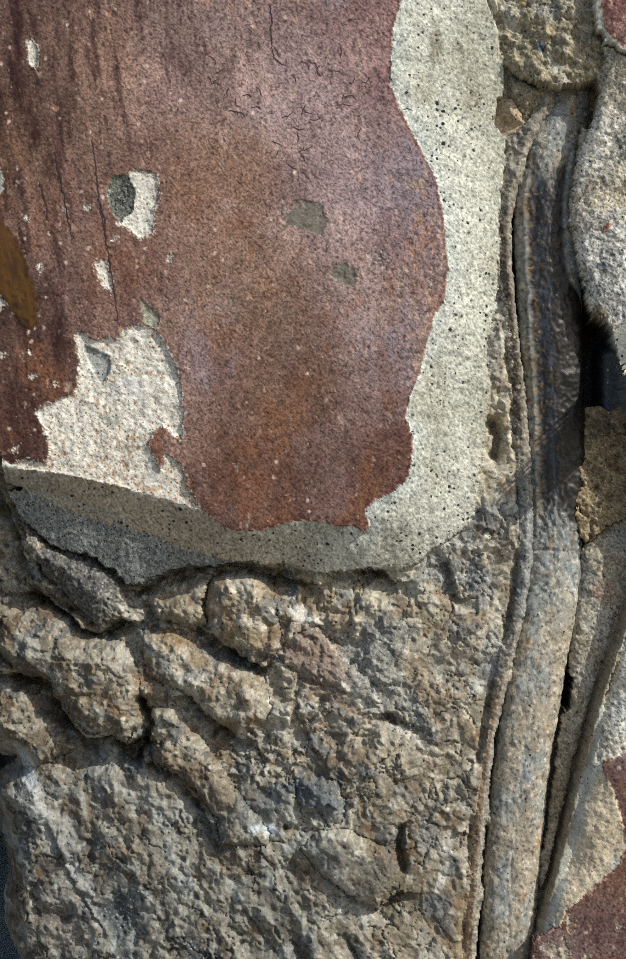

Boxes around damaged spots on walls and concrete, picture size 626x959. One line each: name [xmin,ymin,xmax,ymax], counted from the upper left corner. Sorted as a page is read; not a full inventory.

rust [0,222,39,328]
spalling [2,0,506,574]
spalling [0,260,520,959]
spalling [463,87,556,959]
spalling [529,80,626,959]
spalling [592,0,626,56]